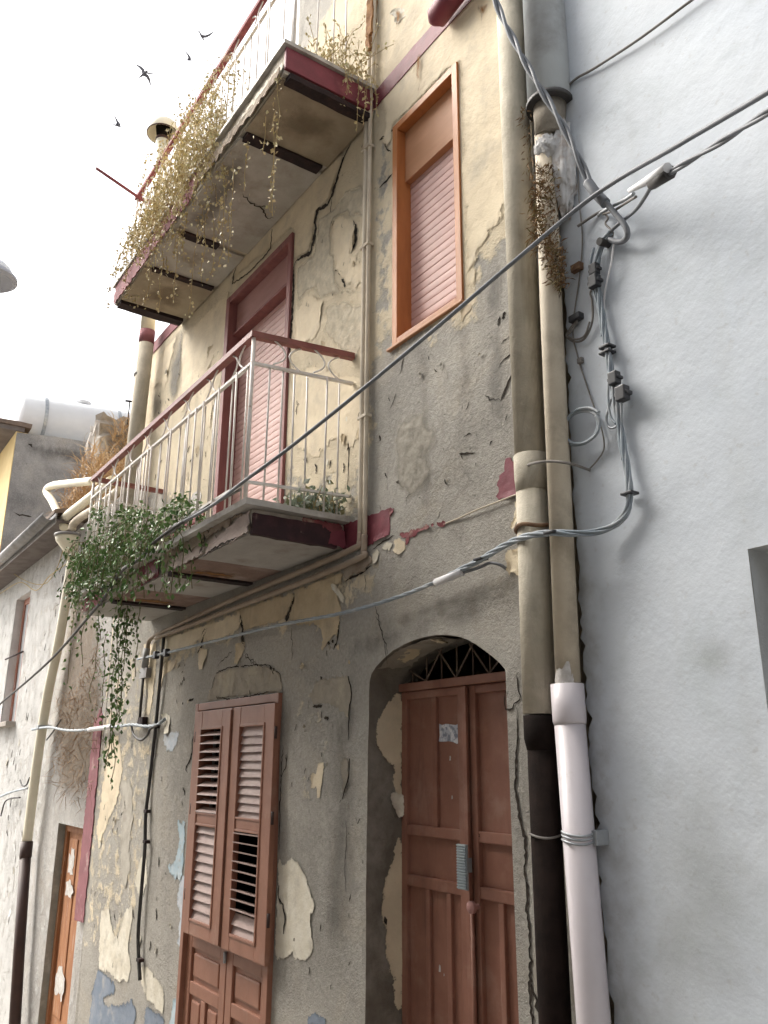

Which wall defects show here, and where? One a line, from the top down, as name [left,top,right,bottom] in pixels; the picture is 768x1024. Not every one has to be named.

crack [232,196,273,284]
crack [289,146,350,351]
peeling [144,507,445,752]
peeling [491,457,517,529]
peeling [505,548,518,575]
peeling [376,680,411,818]
peeling [89,906,176,1024]
peeling [92,734,186,947]
peeling [275,858,321,973]
peeling [381,837,402,1010]
crack [504,672,538,1024]